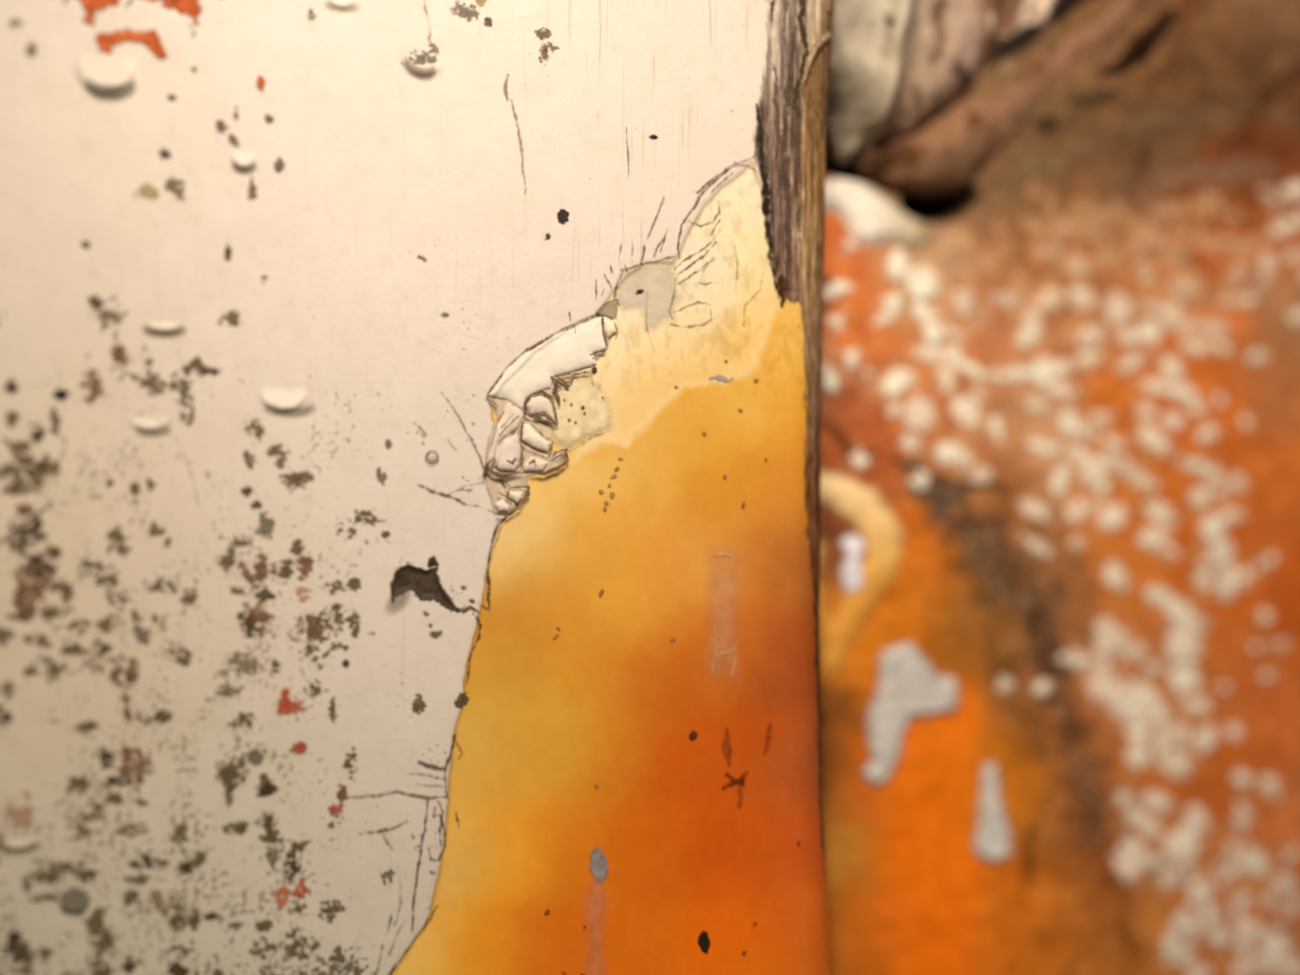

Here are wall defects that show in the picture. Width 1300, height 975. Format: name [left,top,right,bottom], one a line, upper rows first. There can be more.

spalling [134,177,185,202]
spalling [247,176,257,199]
peeling [274,157,284,172]
spalling [219,309,240,326]
spalling [243,418,314,493]
spalling [0,294,222,726]
spalling [337,509,390,538]
spalling [215,487,361,721]
peeling [390,162,1300,975]
water stain [910,481,1107,844]
spalling [21,858,97,902]
spalling [60,745,375,975]